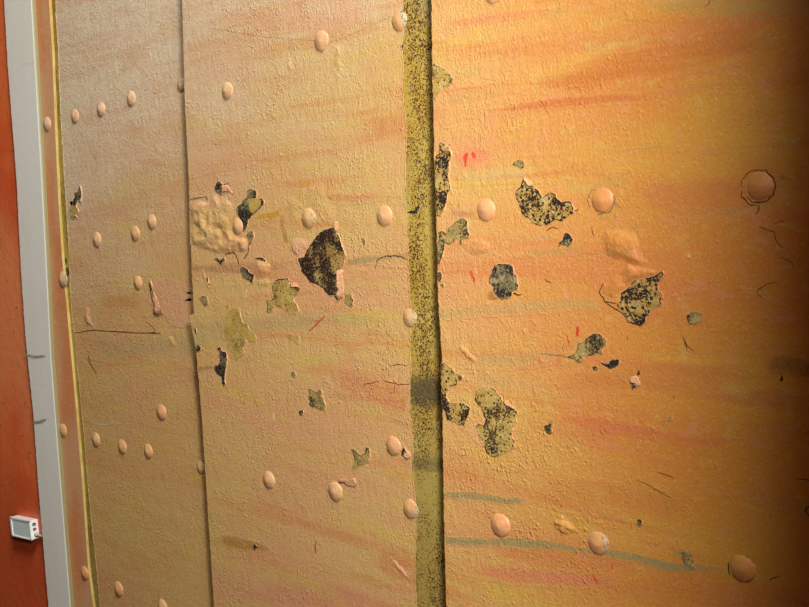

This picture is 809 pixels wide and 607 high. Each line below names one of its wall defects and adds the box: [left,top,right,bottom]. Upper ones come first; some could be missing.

crack [75,322,160,334]
peeling [214,304,256,388]
peeling [236,188,266,284]
peeling [266,278,301,316]
peeling [298,222,354,307]
peeling [400,0,521,607]
peeling [512,160,579,226]
peeling [558,232,574,248]
peeling [567,333,620,371]
peeling [616,271,665,327]
crack [740,169,794,267]